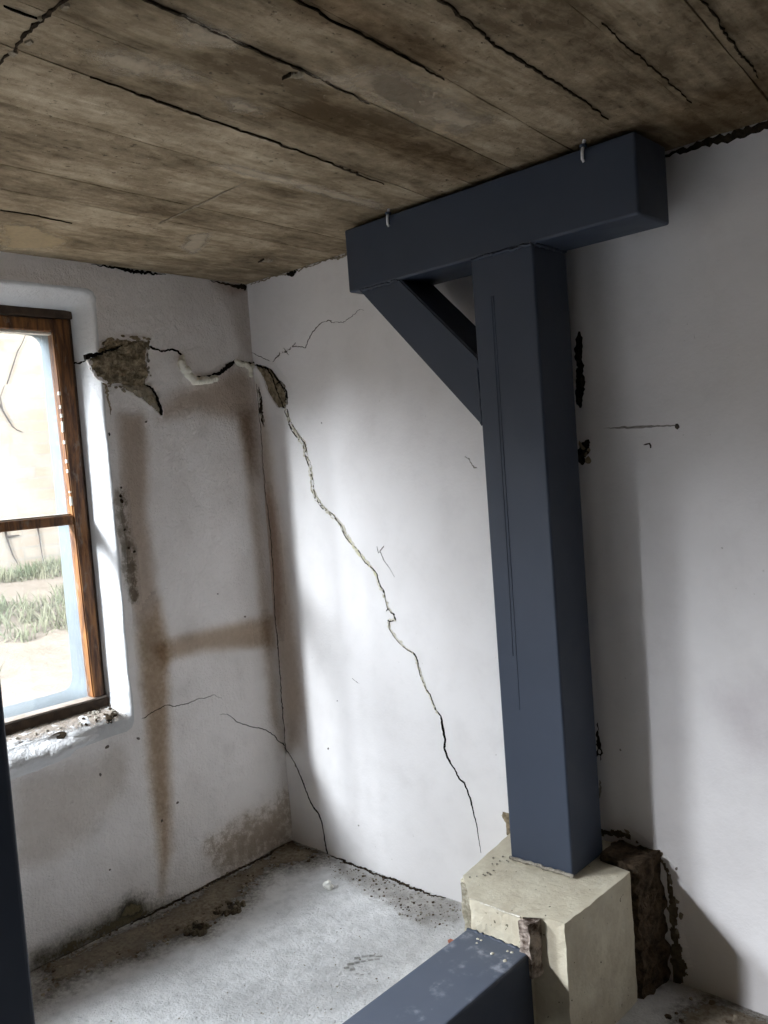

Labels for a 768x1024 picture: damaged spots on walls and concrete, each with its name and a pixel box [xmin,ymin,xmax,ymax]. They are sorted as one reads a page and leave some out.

spalling [83,335,165,423]
spalling [253,357,294,427]
spalling [574,331,585,408]
spalling [578,439,591,465]
crack [144,309,446,898]
crack [284,405,481,852]
leakage [31,899,163,972]
spalling [601,822,694,984]